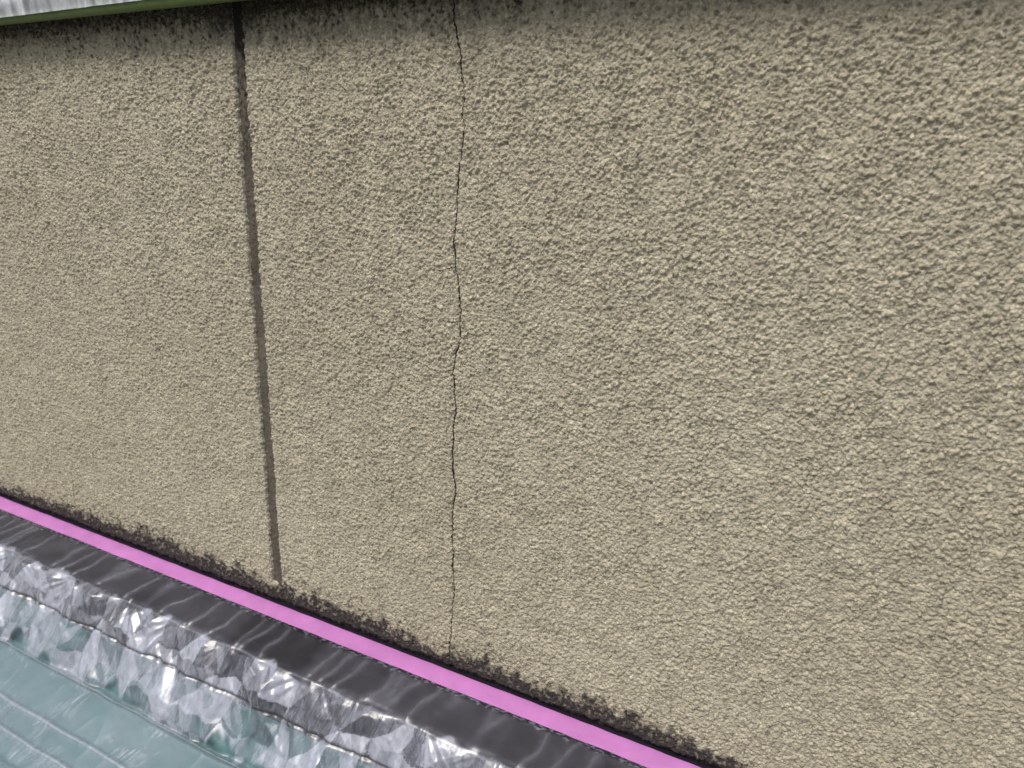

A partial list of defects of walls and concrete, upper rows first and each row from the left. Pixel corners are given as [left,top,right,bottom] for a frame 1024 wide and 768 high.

damp [0,485,748,768]
crack [438,0,469,659]